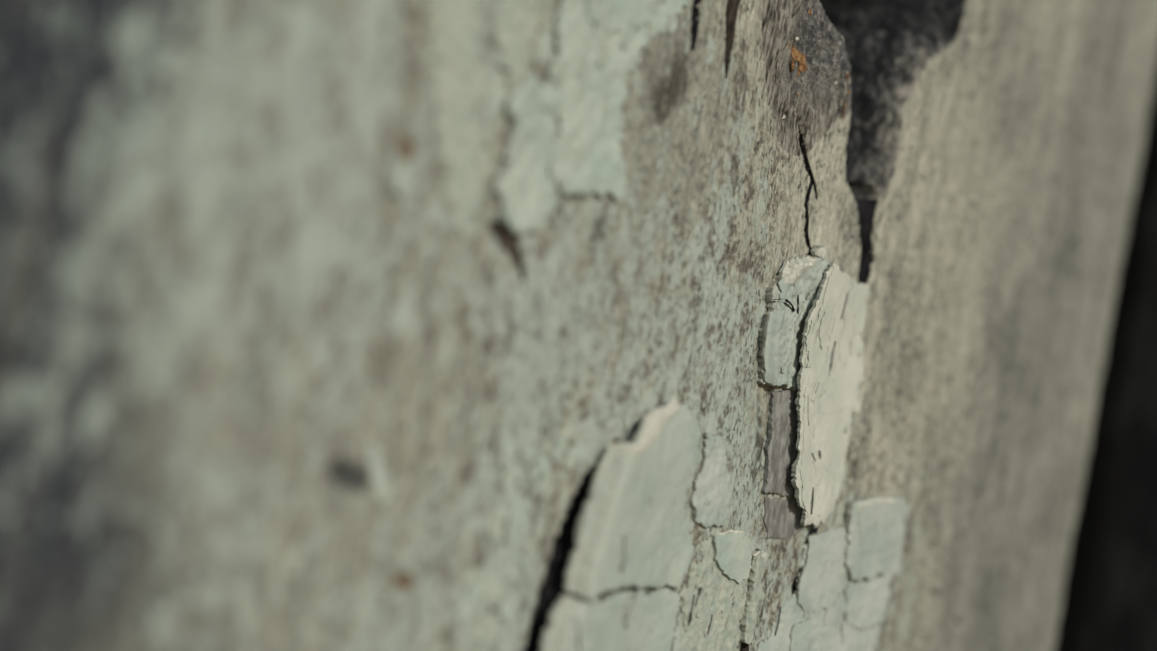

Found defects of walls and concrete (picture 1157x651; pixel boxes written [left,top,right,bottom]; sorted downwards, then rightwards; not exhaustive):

crack [798,125,818,255]
crack [854,197,879,284]
peeling [365,437,392,506]
peeling [539,245,910,651]
crack [522,439,620,651]